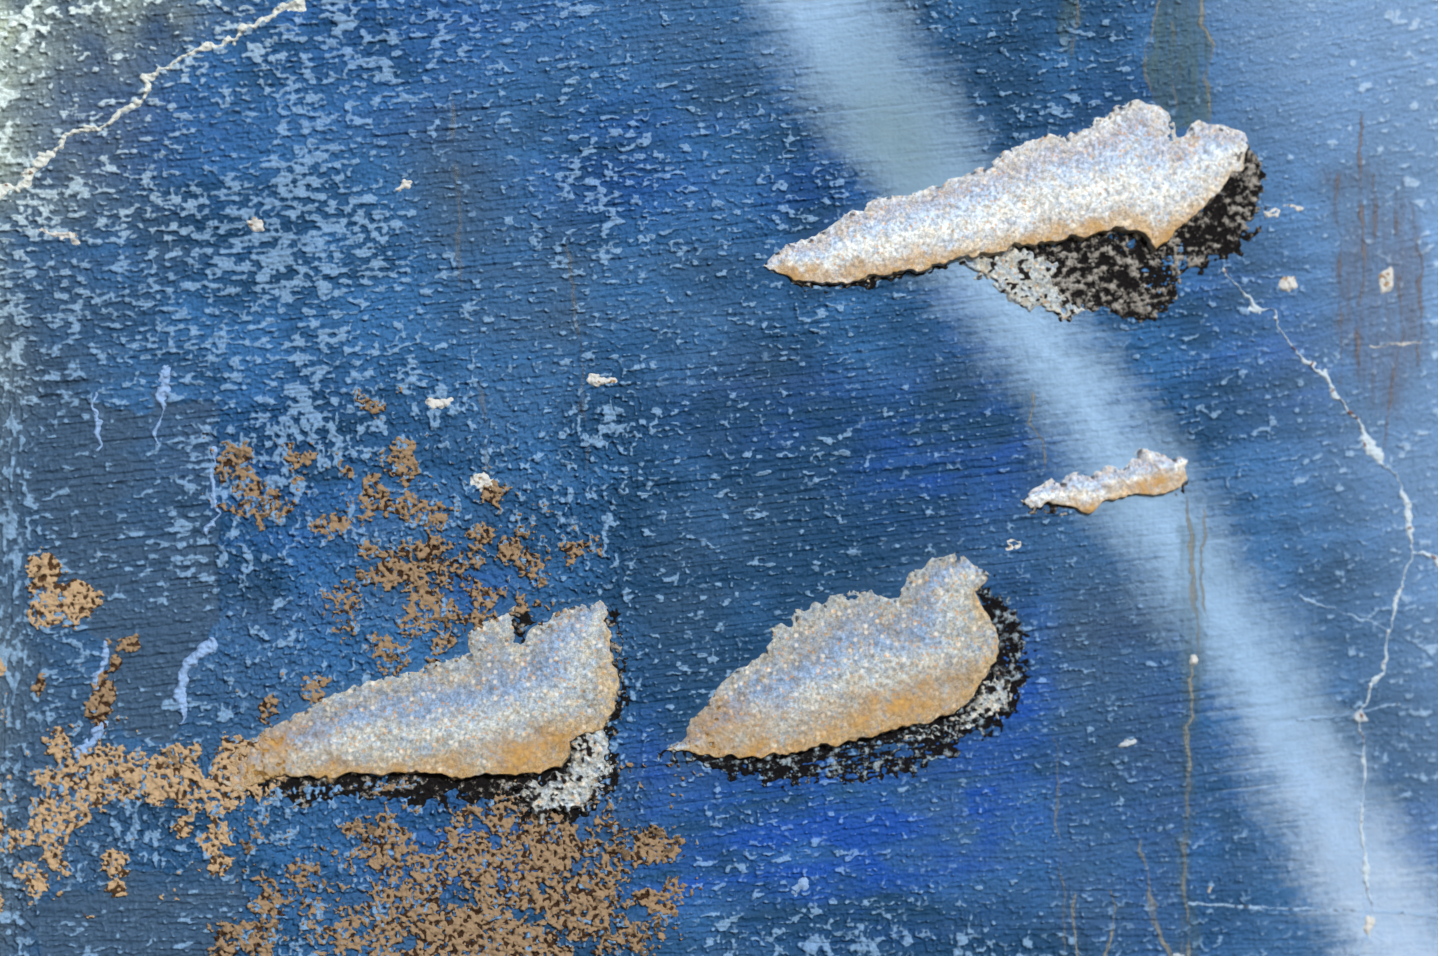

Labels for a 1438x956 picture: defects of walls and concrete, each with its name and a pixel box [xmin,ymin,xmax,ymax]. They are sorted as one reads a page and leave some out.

crack [0,0,306,202]
spalling [764,100,1267,332]
peeling [353,387,402,420]
spalling [0,433,1037,956]
rust [503,733,569,775]
crack [1187,268,1438,956]